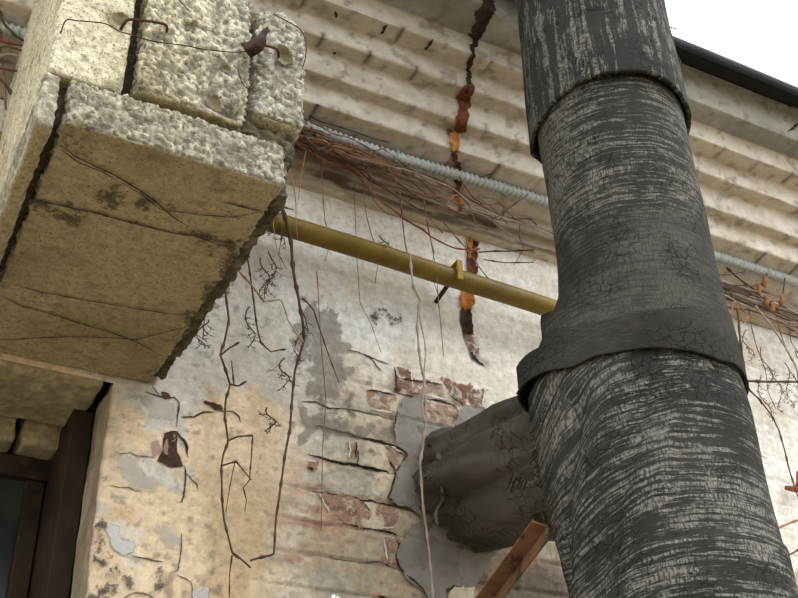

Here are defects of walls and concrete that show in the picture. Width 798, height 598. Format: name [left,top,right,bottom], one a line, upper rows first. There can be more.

crack [446,0,496,212]
crack [30,145,264,247]
crack [466,237,479,274]
crack [1,283,195,360]
crack [460,291,484,366]
spalling [367,366,488,427]
spalling [151,431,189,467]
spalling [346,441,358,461]
spalling [386,445,408,471]
damp [85,518,133,598]
peeling [105,523,135,556]
spalling [316,492,401,565]